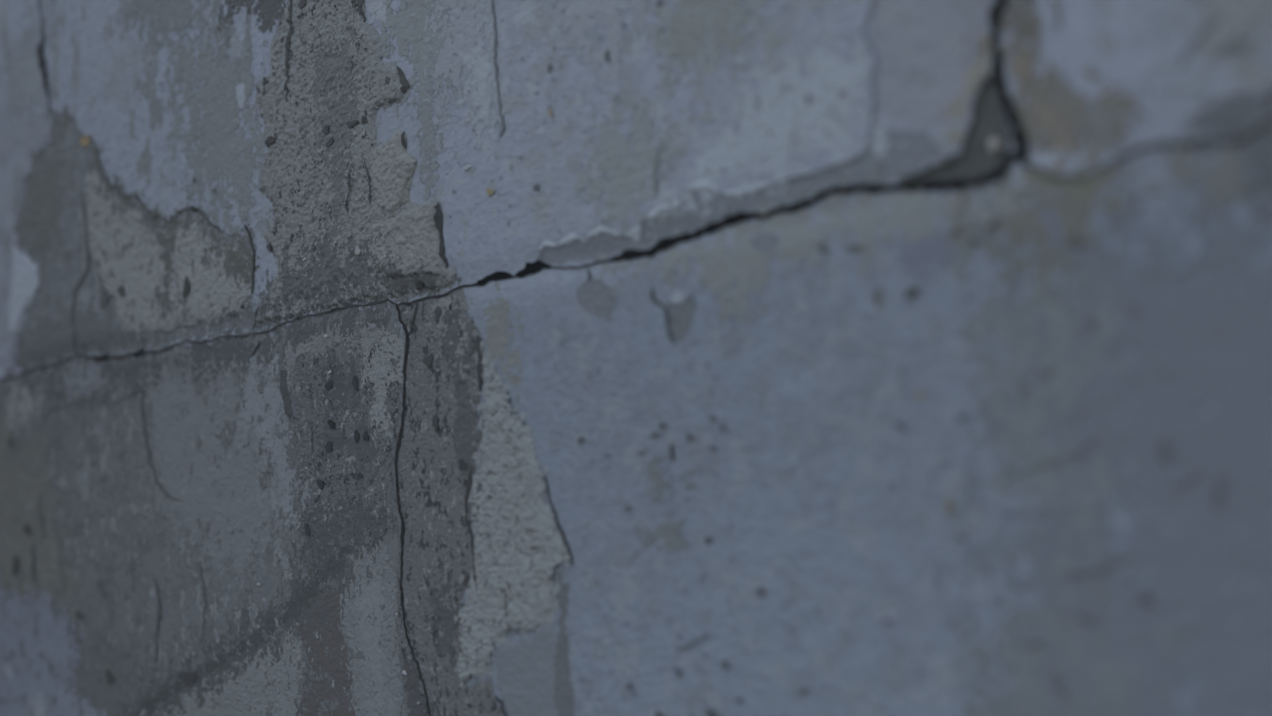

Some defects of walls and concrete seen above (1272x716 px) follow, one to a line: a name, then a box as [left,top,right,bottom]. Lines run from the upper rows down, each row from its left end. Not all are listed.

crack [37,0,50,113]
peeling [9,247,38,333]
crack [0,189,135,382]
crack [95,149,221,232]
spalling [84,0,577,687]
crack [141,0,1029,716]